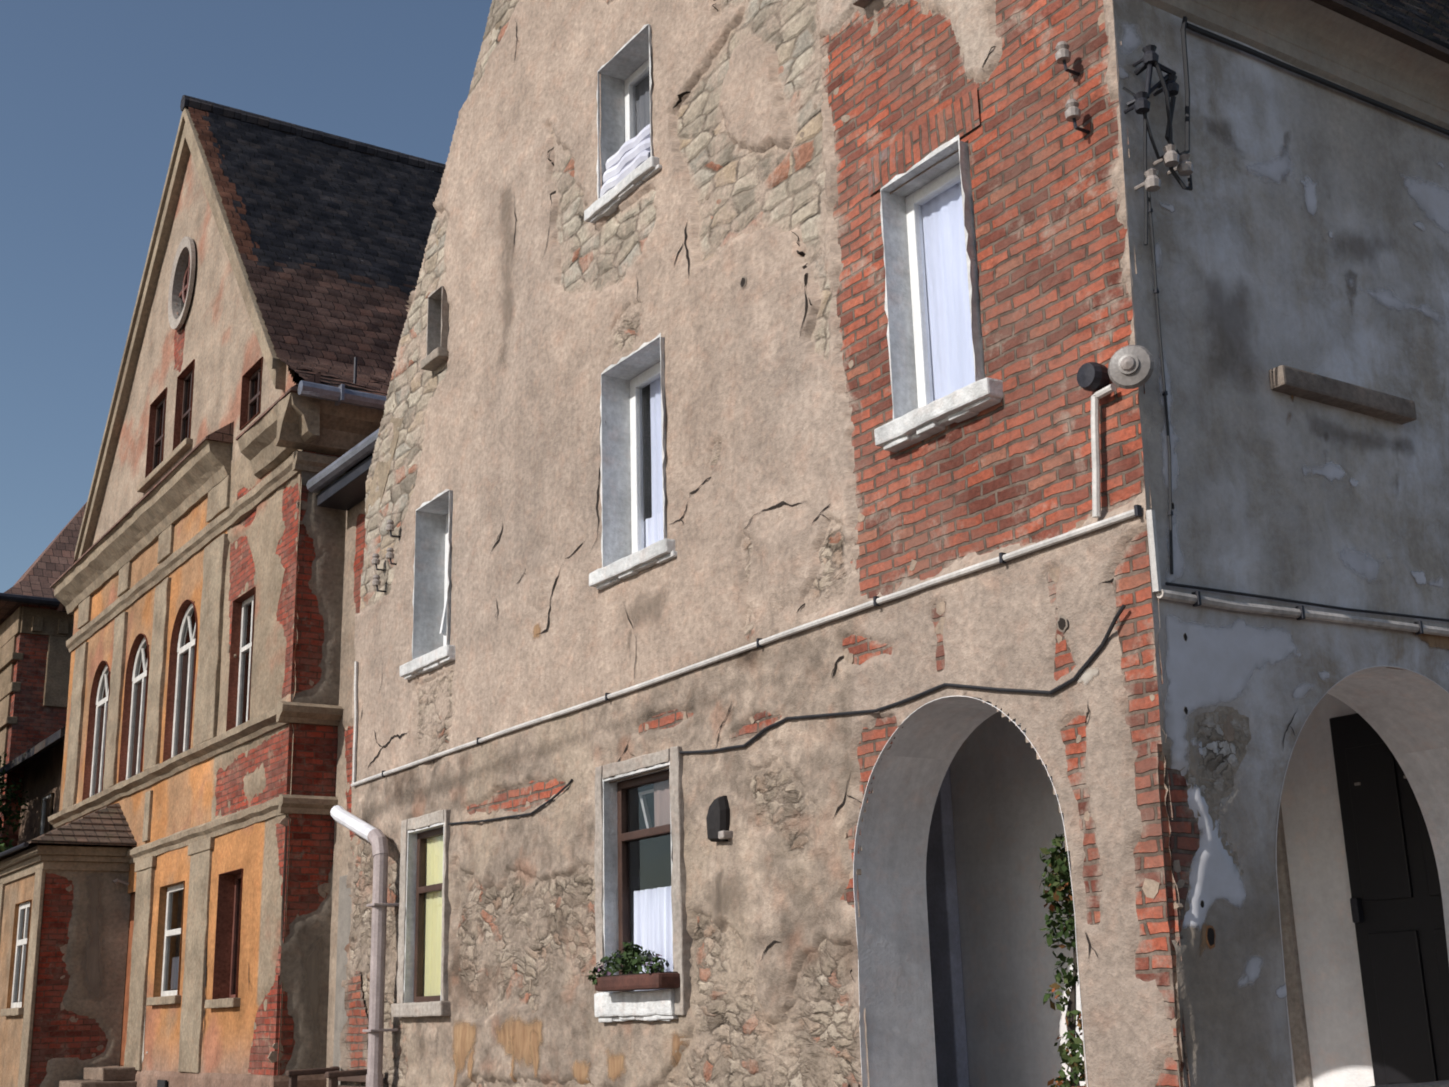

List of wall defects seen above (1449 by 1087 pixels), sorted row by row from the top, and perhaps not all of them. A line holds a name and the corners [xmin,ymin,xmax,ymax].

spalling [550,126,657,296]
crack [674,220,689,275]
peeling [1405,178,1449,232]
spalling [275,472,324,702]
crack [495,421,606,635]
crack [744,501,831,529]
spalling [658,0,1301,1087]
crack [360,672,407,765]
spalling [466,778,566,815]
spalling [29,873,108,1087]
spalling [215,723,409,1087]